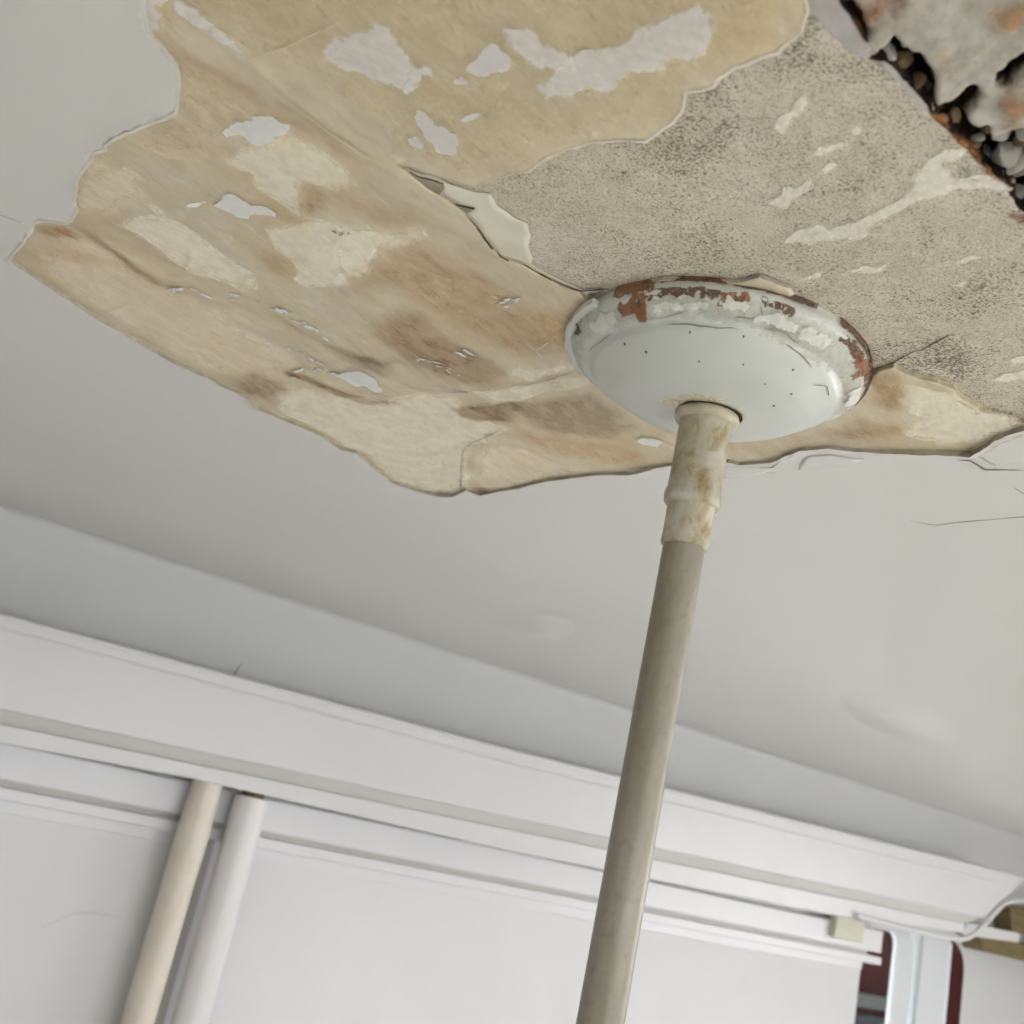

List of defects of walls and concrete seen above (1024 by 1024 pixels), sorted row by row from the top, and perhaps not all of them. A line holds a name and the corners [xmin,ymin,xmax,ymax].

peeling [7,0,1024,498]
leakage [382,249,570,353]
leakage [240,371,395,405]
leakage [342,351,386,374]
leakage [377,314,506,384]
crack [875,333,955,369]
leakage [454,396,640,463]
crack [914,449,1024,525]